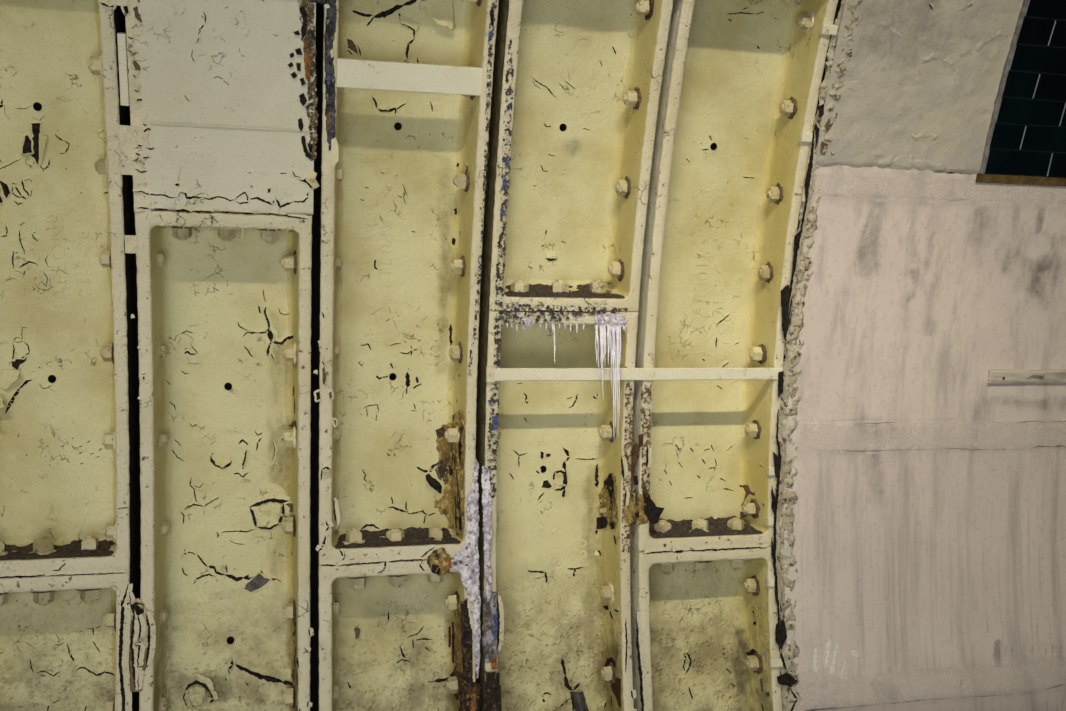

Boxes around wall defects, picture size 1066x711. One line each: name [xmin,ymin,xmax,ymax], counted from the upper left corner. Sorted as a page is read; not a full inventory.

crack [399,13,422,64]
rust [288,0,339,169]
peeling [0,120,53,206]
crack [133,187,312,219]
peeling [0,325,33,415]
crack [238,289,293,361]
damp [500,303,628,328]
rust [434,398,465,539]
rust [595,434,665,546]
damp [451,459,493,678]
rust [446,591,504,711]